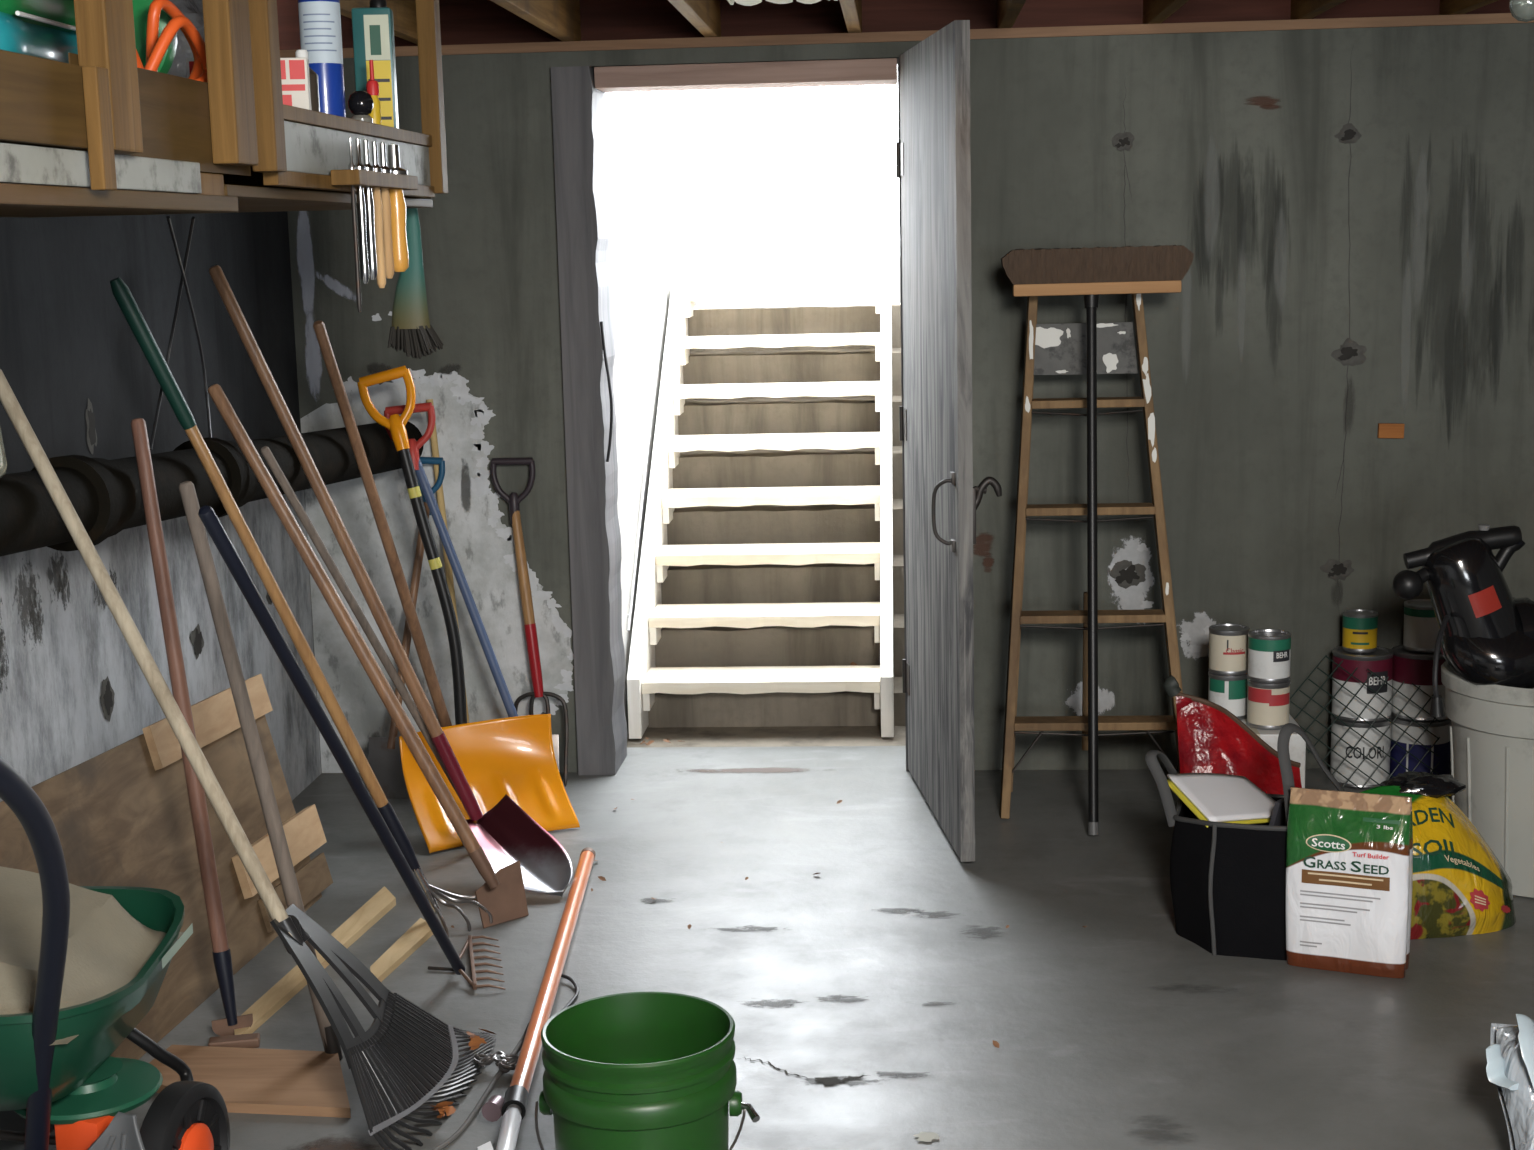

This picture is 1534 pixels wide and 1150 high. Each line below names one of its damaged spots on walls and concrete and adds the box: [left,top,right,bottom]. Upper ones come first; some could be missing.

rust [1249,97,1279,109]
damp [0,552,70,692]
damp [93,569,119,608]
peeling [300,369,574,773]